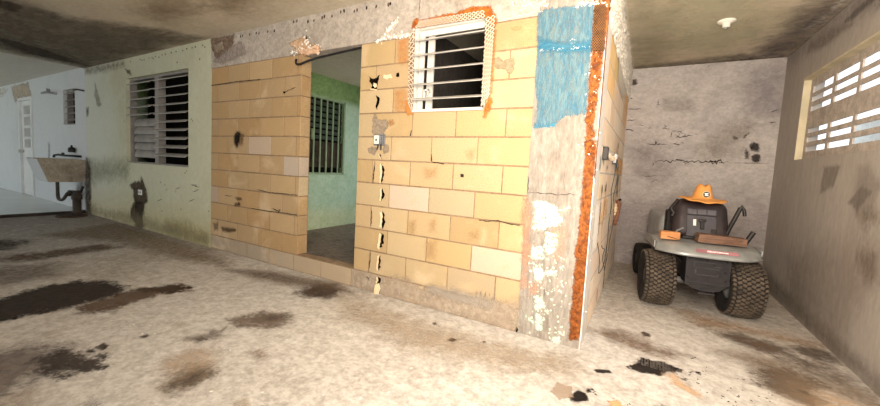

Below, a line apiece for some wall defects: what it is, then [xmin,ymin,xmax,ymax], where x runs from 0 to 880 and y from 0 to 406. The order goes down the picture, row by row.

water stain [0,38,79,64]
corrosion [400,6,498,118]
peeling [507,0,637,128]
mould [636,5,839,68]
crack [366,154,385,294]
corrosion [521,199,538,294]
peeling [524,200,570,344]
corrosion [569,0,611,341]
crack [626,98,768,167]